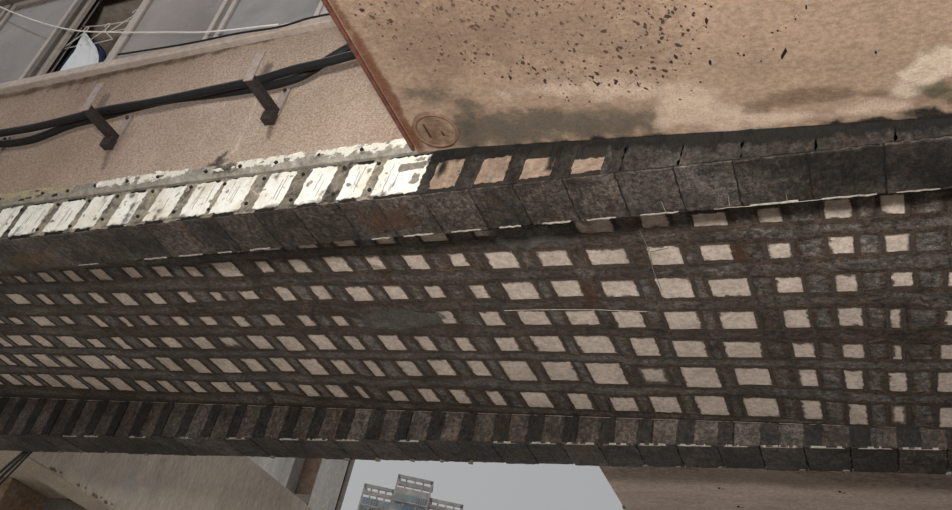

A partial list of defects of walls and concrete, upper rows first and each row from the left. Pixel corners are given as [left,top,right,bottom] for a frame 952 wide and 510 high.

damp [355,0,952,177]
peeling [0,138,465,237]